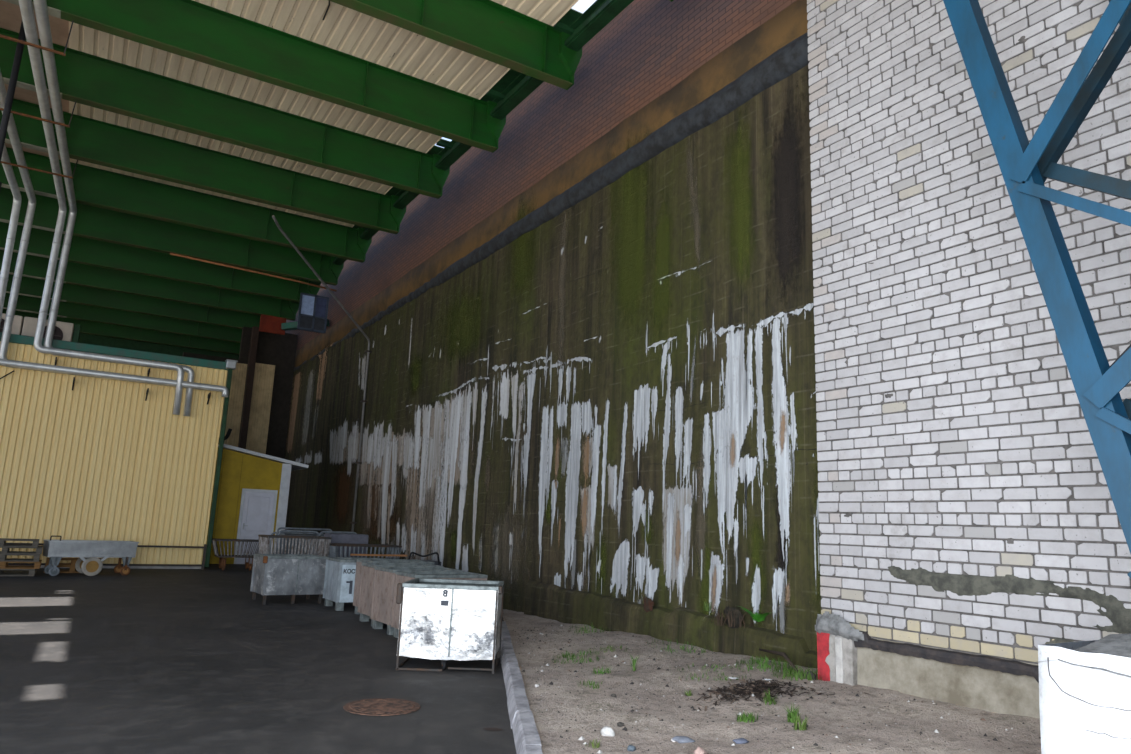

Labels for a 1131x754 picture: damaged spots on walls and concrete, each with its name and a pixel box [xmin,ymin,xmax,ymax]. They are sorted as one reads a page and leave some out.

damp [295,105,815,634]